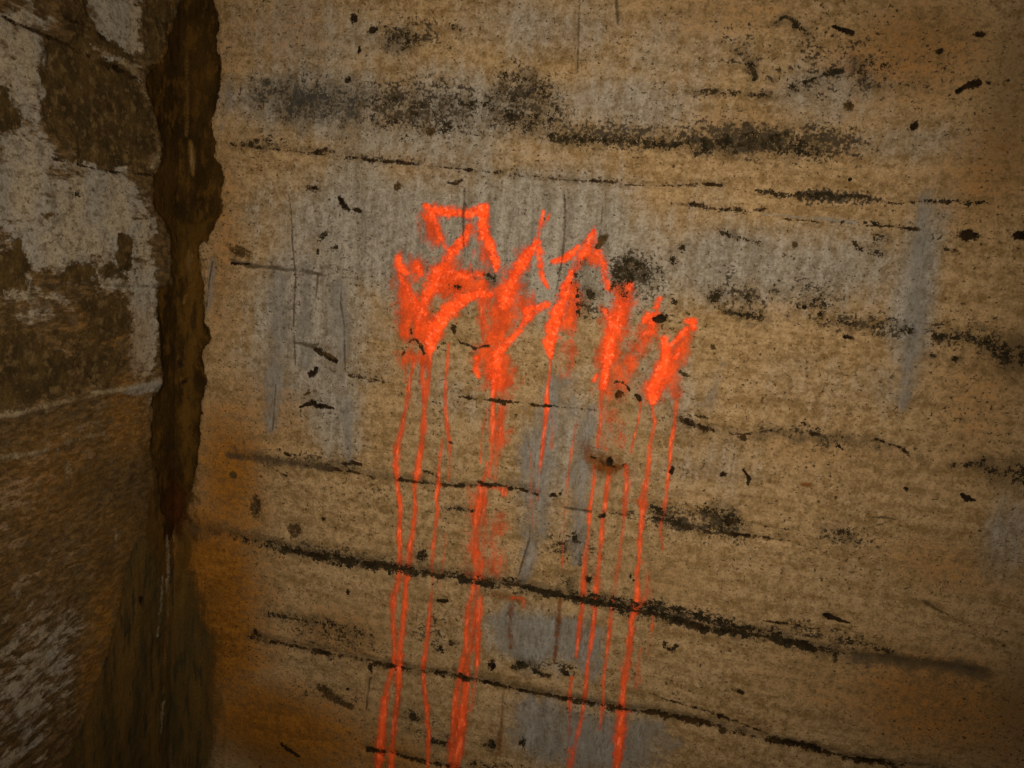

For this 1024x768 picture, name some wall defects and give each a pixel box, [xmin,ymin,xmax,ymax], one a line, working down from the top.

leakage [694,56,767,99]
leakage [789,54,887,93]
leakage [248,66,827,161]
leakage [230,135,293,153]
leakage [63,528,217,768]
leakage [268,609,373,639]
leakage [491,603,601,680]